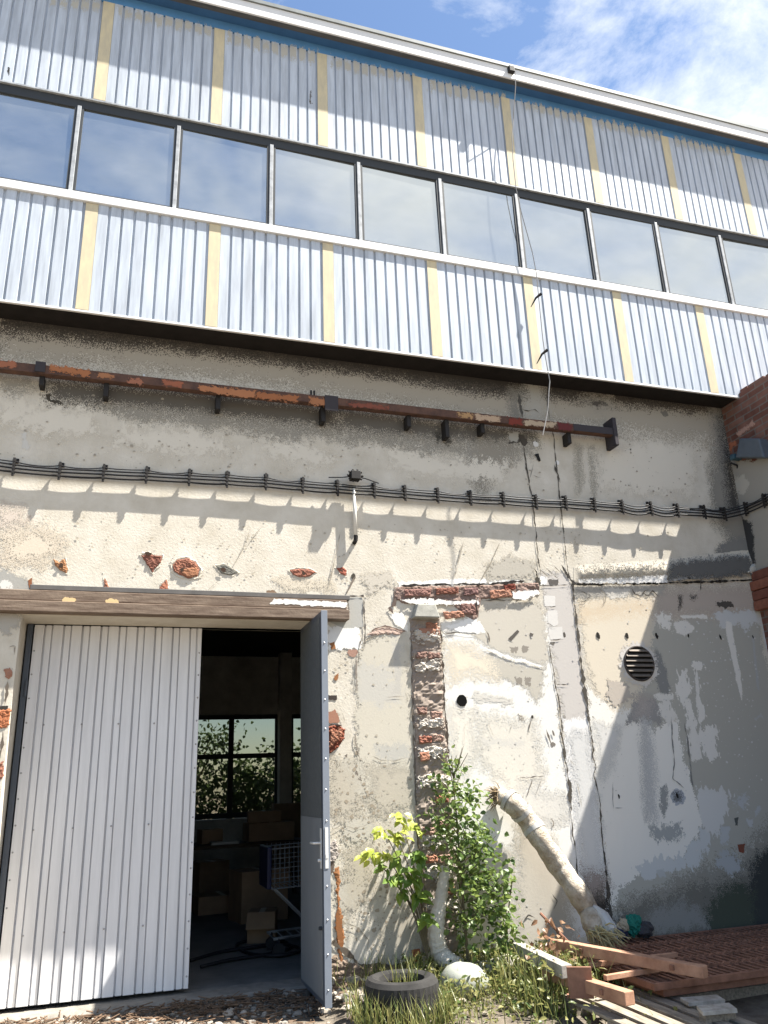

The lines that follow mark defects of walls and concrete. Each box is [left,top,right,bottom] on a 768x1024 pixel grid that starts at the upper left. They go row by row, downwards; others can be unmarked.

rust [0,360,17,369]
rust [47,363,143,386]
rust [162,379,185,388]
rust [198,385,325,407]
rust [457,412,573,431]
spalling [53,556,69,575]
spalling [139,551,240,589]
spalling [288,567,317,579]
crack [329,386,614,926]
spalling [0,708,12,729]
flaking render [328,576,559,952]